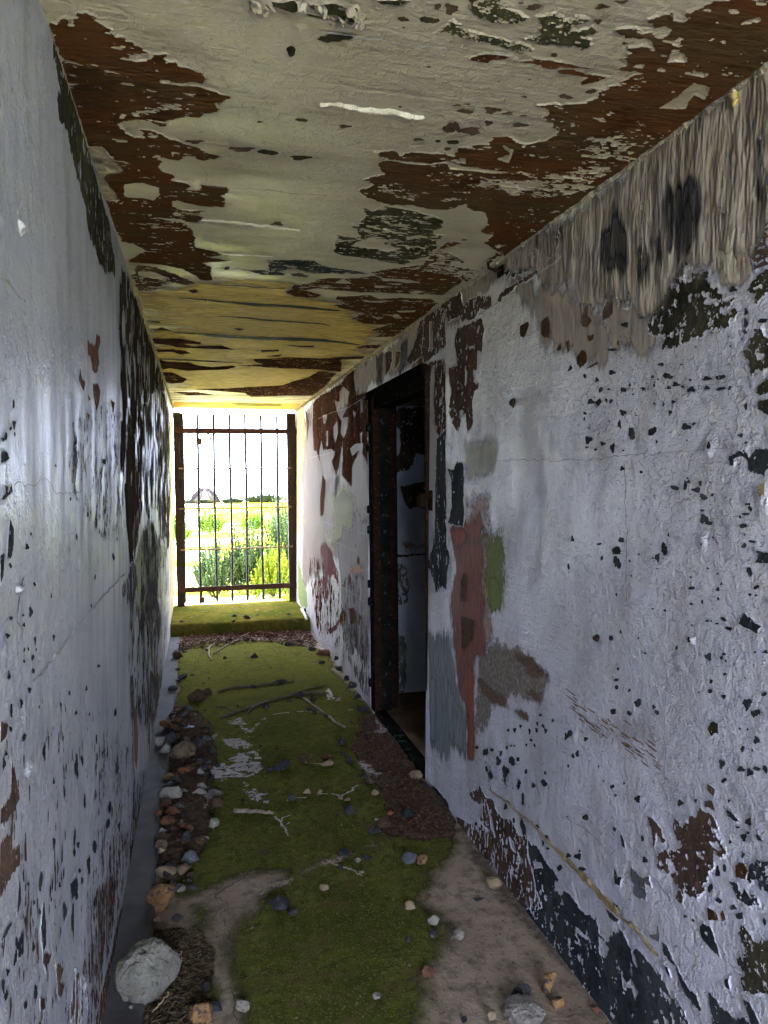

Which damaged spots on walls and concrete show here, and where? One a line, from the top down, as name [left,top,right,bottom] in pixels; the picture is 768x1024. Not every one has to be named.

leakage [461,71,768,368]
peeling [0,482,13,502]
peeling [0,399,16,465]
peeling [0,517,29,583]
peeling [47,0,768,753]
peeling [0,687,146,1024]
peeling [430,714,768,1024]